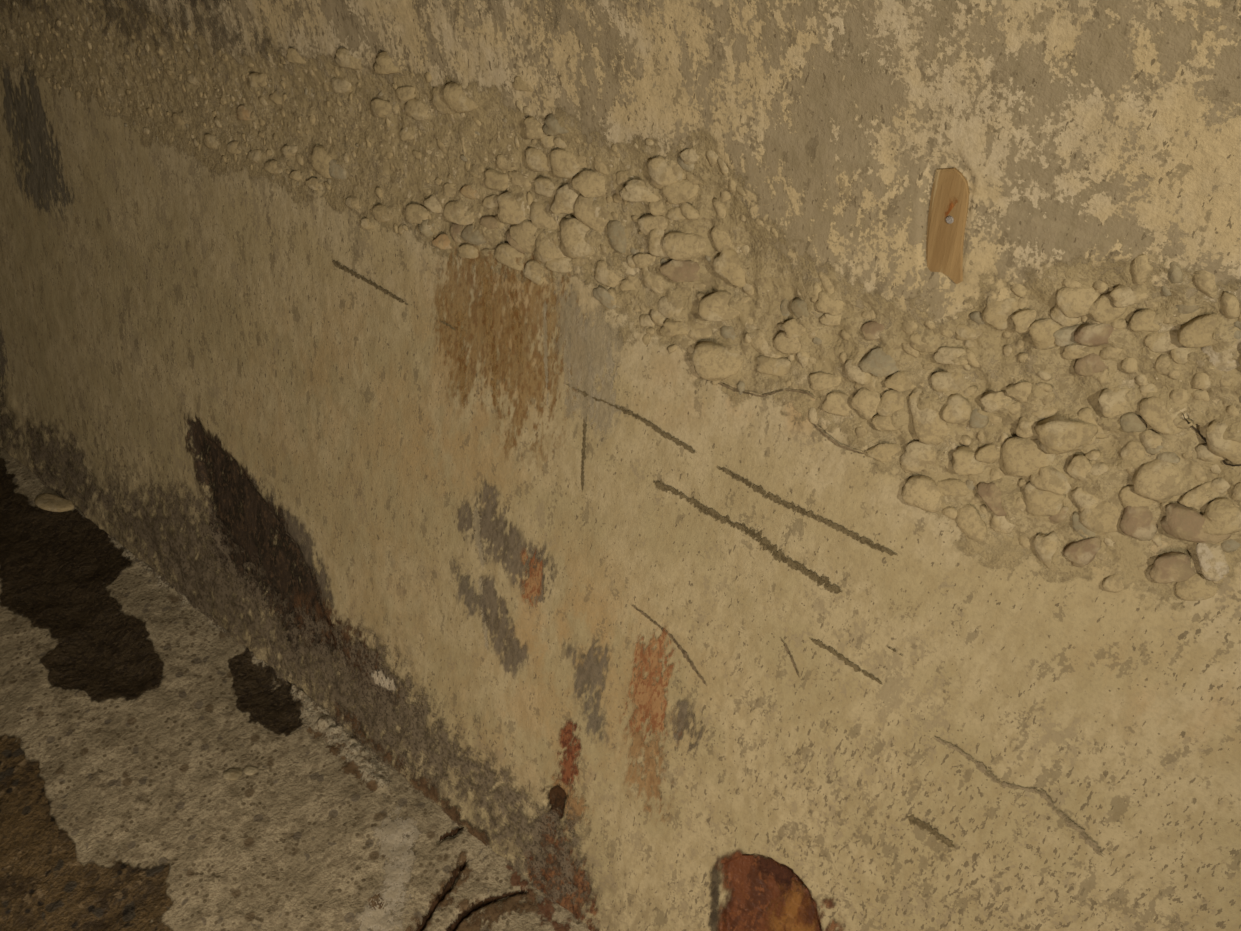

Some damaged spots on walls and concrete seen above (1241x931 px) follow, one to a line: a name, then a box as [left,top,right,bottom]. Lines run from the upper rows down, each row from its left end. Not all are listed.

rust [437,258,622,448]
leakage [0,395,591,909]
peeling [933,737,1102,856]
leakage [353,807,421,931]
rust [708,851,842,931]